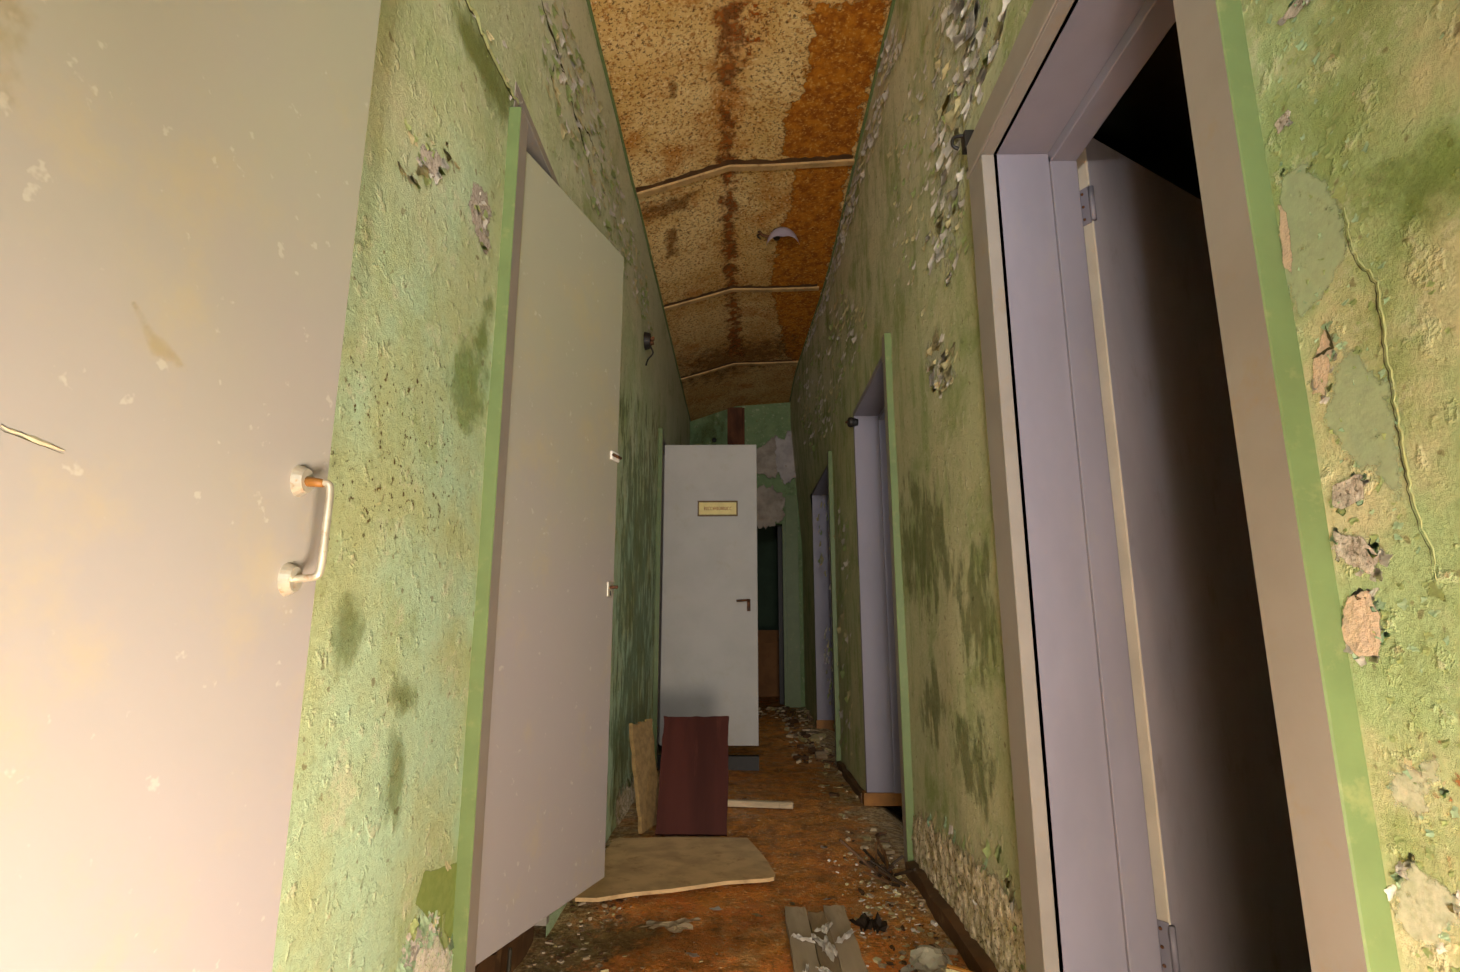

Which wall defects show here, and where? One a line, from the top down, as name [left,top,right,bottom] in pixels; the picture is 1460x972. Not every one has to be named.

peeling [397,117,461,189]
peeling [468,182,492,255]
corrosion [679,0,892,385]
peeling [925,0,1011,288]
peeling [921,306,958,399]
flaking render [757,431,796,529]
spalling [395,861,457,972]